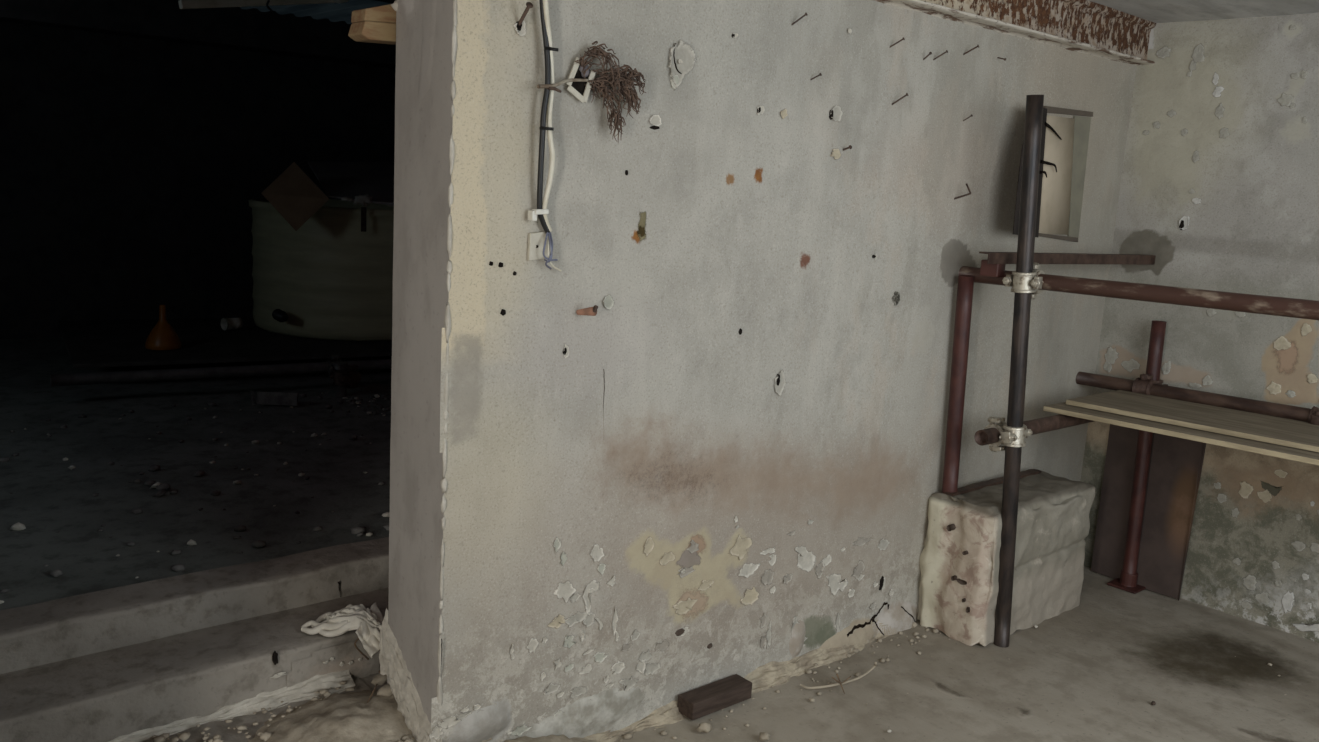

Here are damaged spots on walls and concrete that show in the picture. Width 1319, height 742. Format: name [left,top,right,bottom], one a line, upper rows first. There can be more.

flaking render [429,0,905,742]
flaking render [1095,340,1220,393]
flaking render [1258,318,1319,408]
water stain [564,388,936,542]
flaking render [1196,445,1319,533]
crack [847,602,916,636]
flaking render [287,640,380,688]